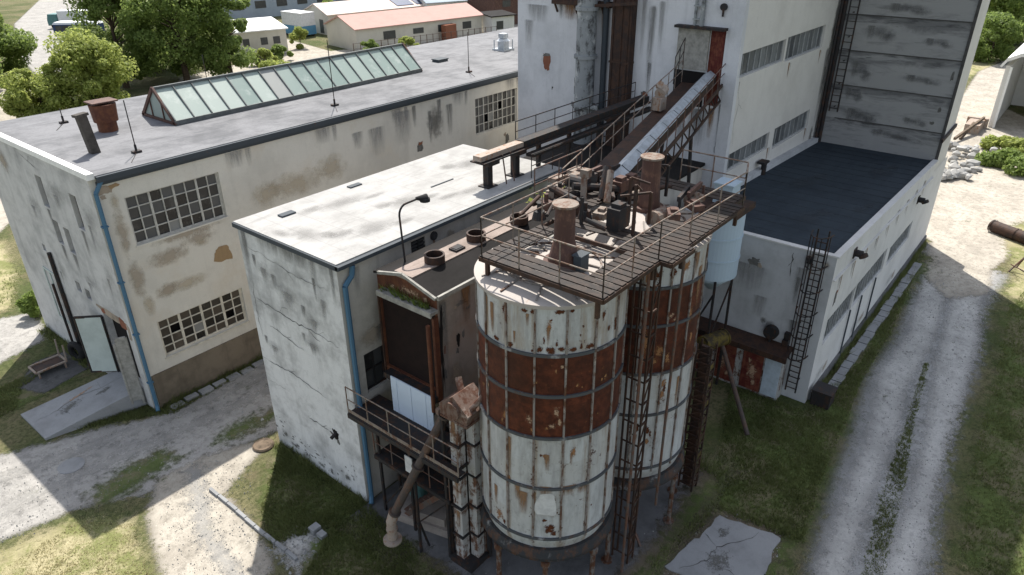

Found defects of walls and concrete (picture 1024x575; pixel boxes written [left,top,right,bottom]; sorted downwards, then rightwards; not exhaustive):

crack [252,281,335,397]
rust [486,296,515,348]
rust [531,309,594,354]